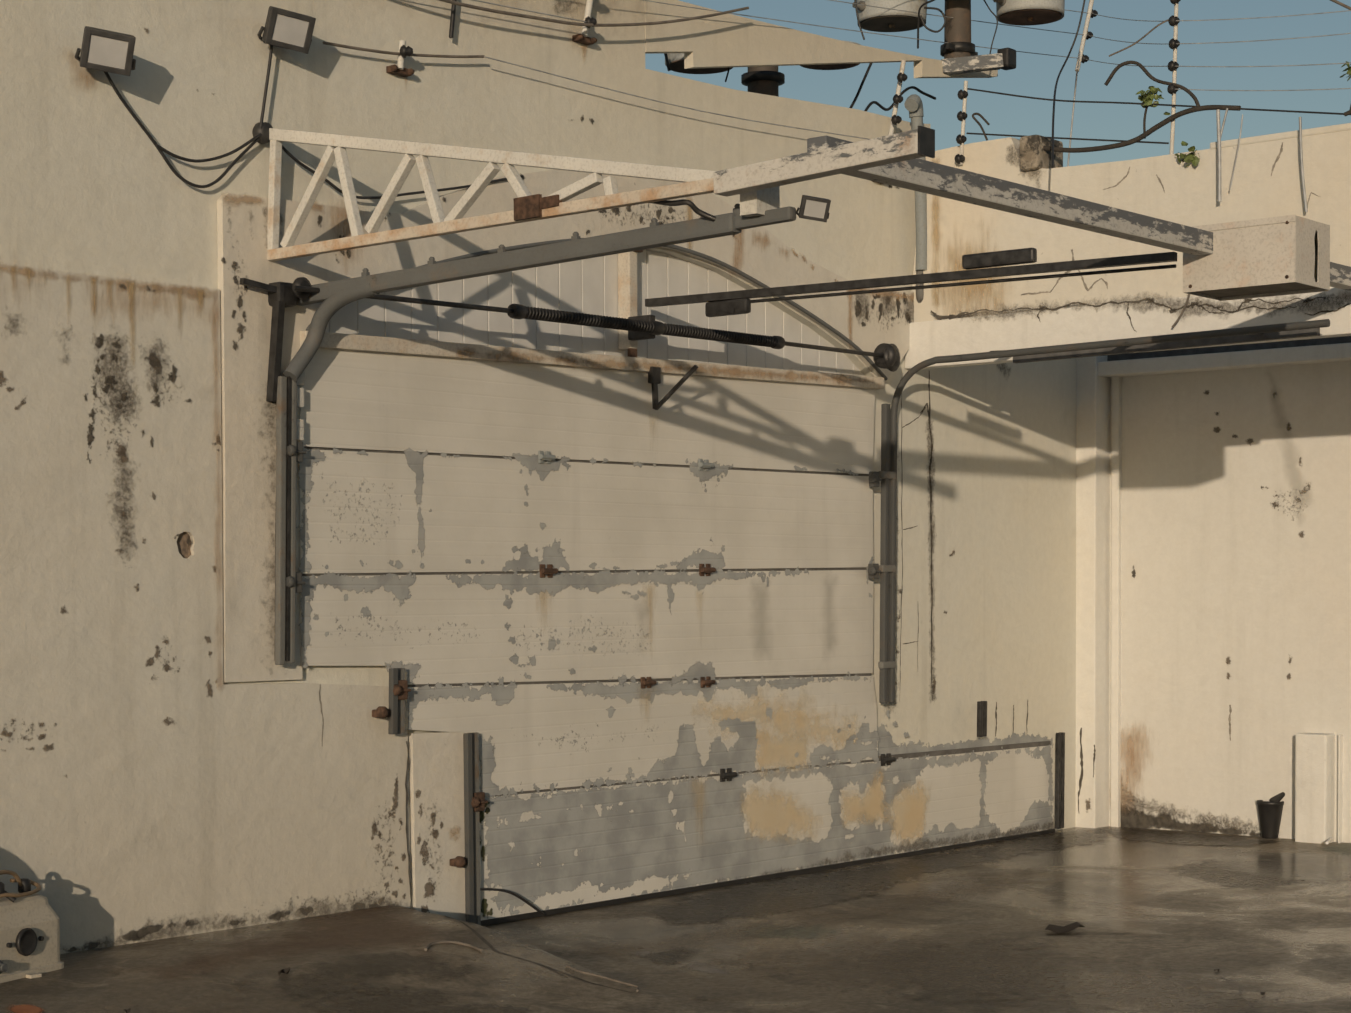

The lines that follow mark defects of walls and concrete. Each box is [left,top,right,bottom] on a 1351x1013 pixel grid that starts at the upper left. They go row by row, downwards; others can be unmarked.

rust [119,282,204,316]
crack [930,249,1351,332]
mould [84,334,146,552]
hole [175,532,192,558]
peeling [298,446,460,671]
peeling [503,453,571,507]
peeling [385,523,809,730]
peeling [546,662,871,718]
crack [900,371,933,699]
mould [66,816,406,952]
peeling [479,708,1054,915]
water stain [646,780,1277,924]